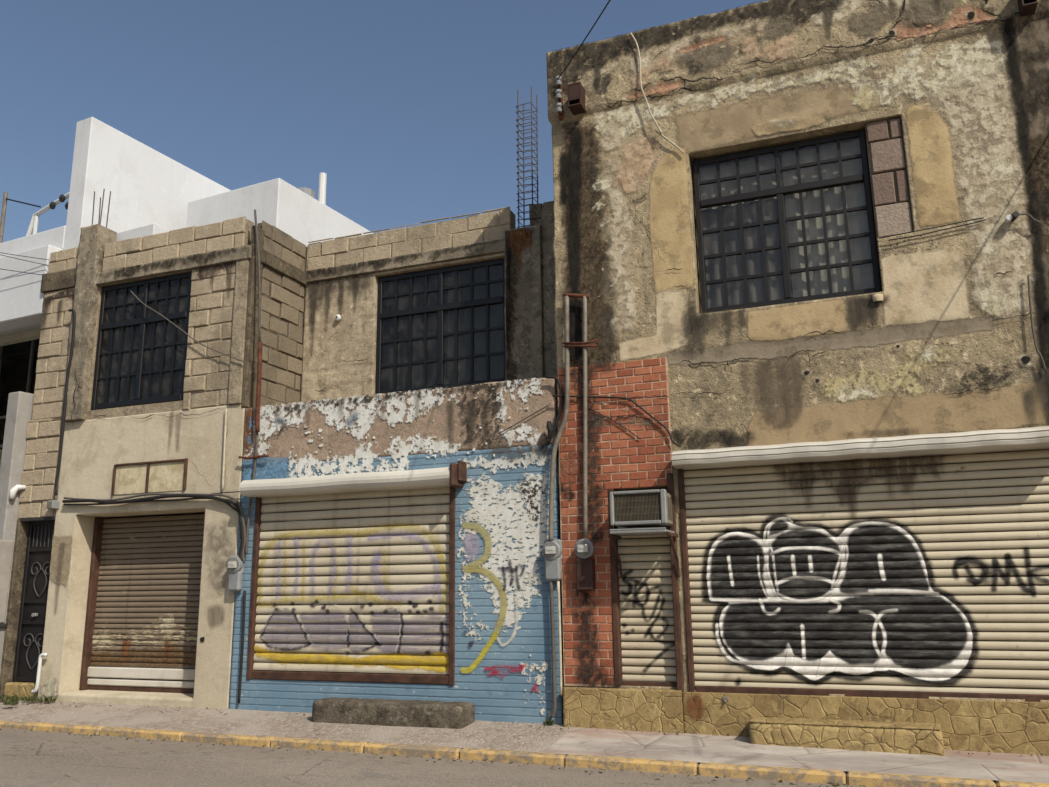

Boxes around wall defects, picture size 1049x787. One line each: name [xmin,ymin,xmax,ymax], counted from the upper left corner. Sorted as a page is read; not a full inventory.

crack [585,0,1020,108]
flaking render [811,0,909,25]
flaking render [888,0,997,40]
damp [546,0,1049,542]
damp [263,228,550,457]
crack [571,330,853,422]
peeling [244,378,592,641]
corrosion [90,640,196,667]
peeling [519,647,551,717]